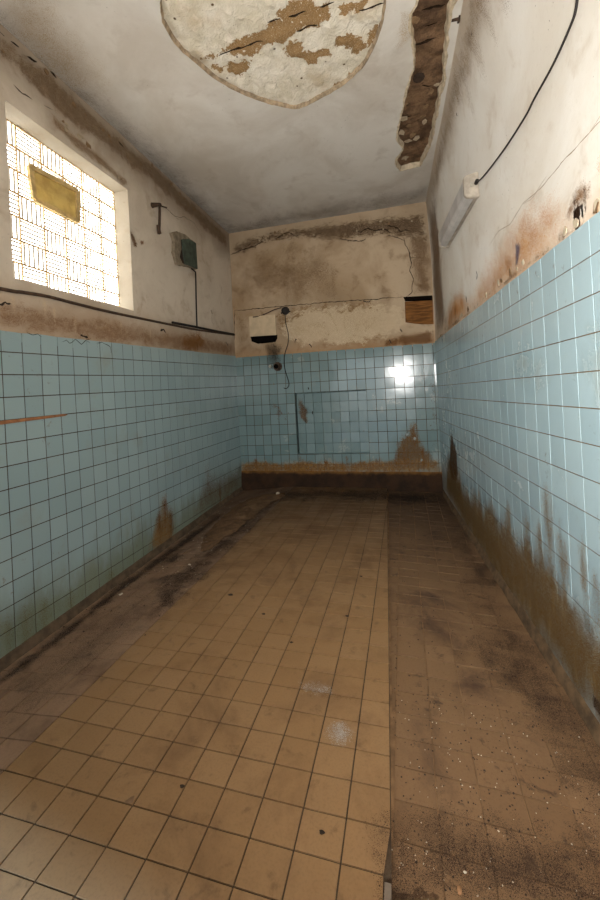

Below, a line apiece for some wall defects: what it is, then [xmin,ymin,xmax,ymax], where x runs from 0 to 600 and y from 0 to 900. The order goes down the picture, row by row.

water stain [0,241,405,357]
flaking render [0,32,428,257]
water stain [0,0,498,335]
flaking render [160,0,386,109]
crack [234,235,415,340]
flaking render [395,0,458,171]
rust [447,180,591,329]
crack [490,117,600,244]
water stain [478,486,600,657]